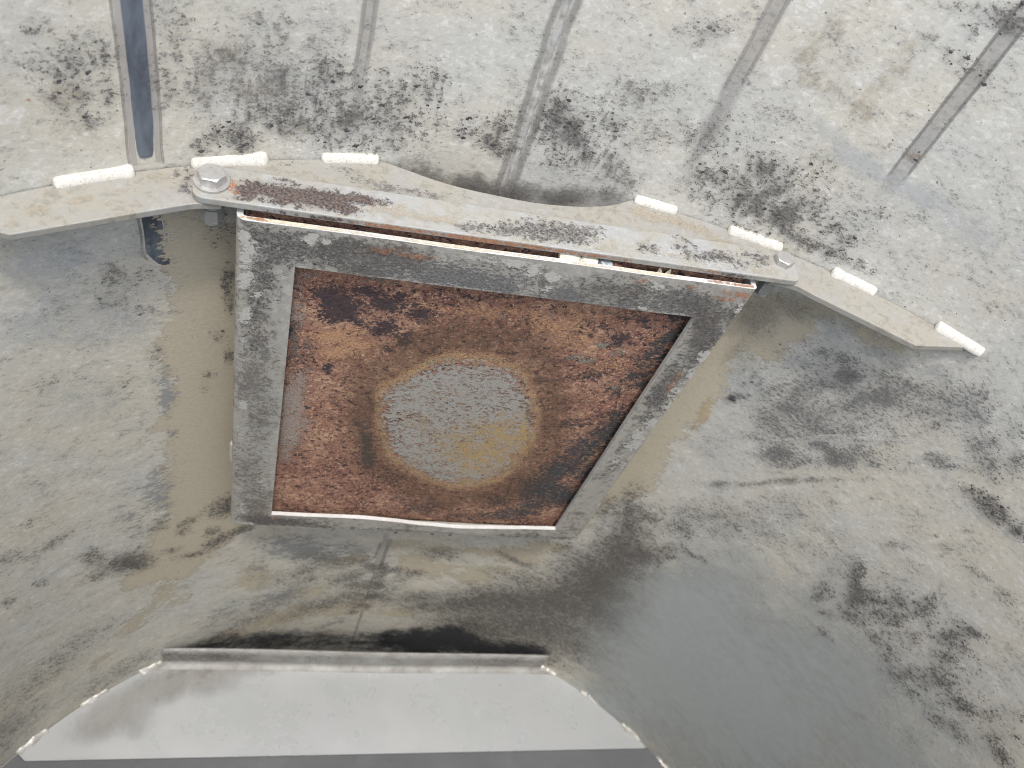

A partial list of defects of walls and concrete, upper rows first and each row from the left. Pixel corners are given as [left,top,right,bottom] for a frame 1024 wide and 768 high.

corrosion [305,325,384,363]
corrosion [346,215,627,262]
corrosion [416,291,647,372]
damp [573,262,679,277]
damp [86,209,555,671]
corrosion [372,350,542,488]
damp [209,291,920,648]
damp [587,565,934,768]